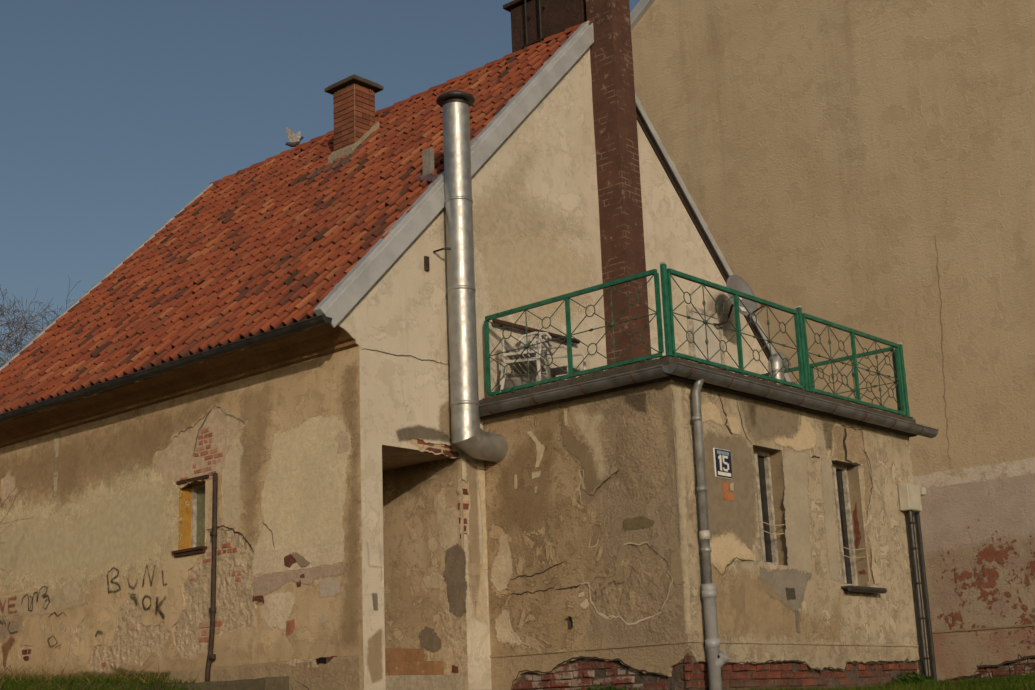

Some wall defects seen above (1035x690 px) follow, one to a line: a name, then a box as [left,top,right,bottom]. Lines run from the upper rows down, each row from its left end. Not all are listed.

flaking render [701,401,741,435]
peeling [0,405,353,673]
flaking render [410,480,471,556]
flaking render [422,573,468,676]
flaking render [490,531,514,593]
flaking render [494,608,531,649]
crack [508,562,581,595]
peeling [710,528,754,576]
flaking render [772,416,881,586]
peeling [931,515,1035,682]
flaking render [511,653,709,690]
flaking render [721,660,917,690]